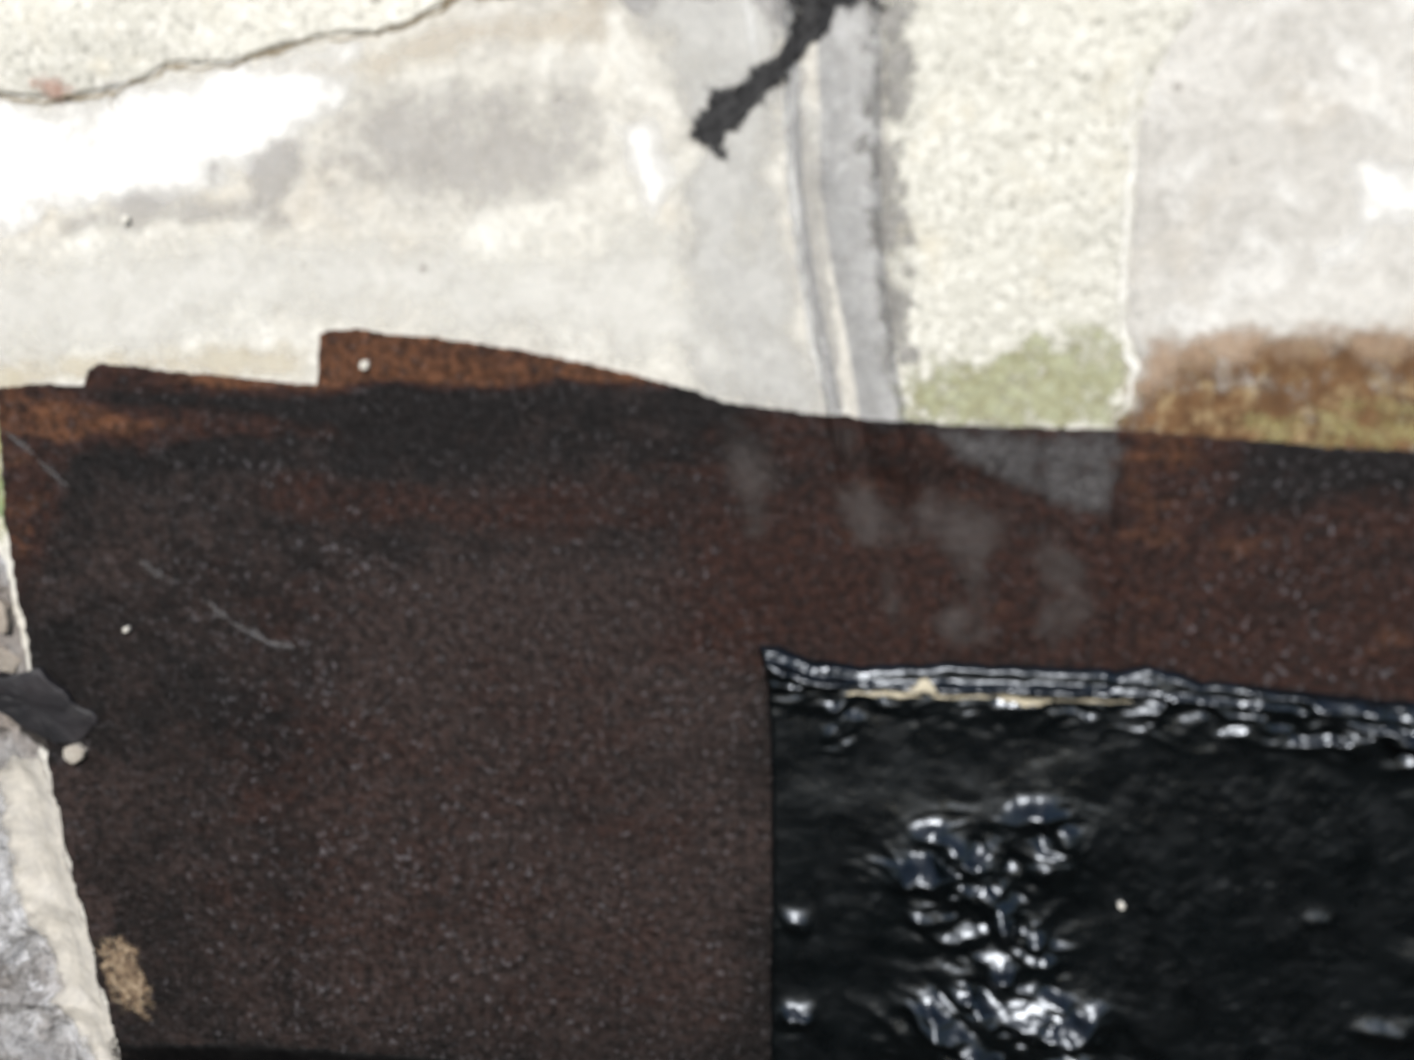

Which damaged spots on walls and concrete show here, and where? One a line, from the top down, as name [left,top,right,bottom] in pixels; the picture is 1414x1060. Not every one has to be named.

crack [0,0,458,112]